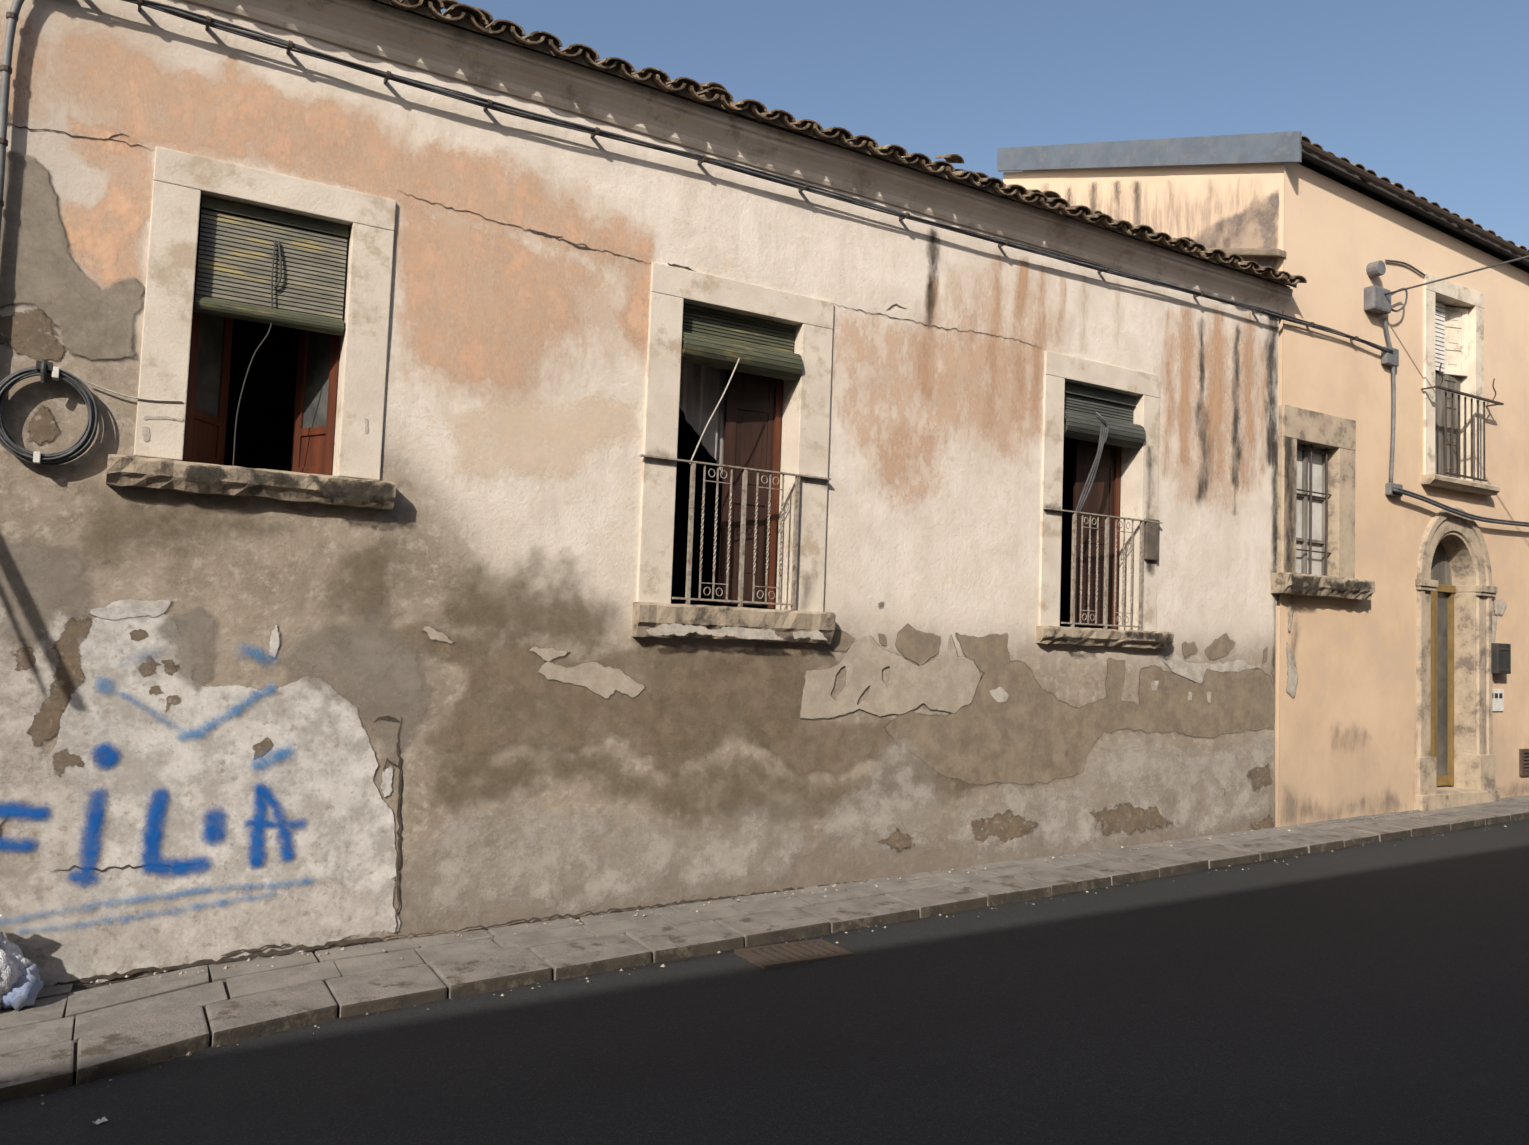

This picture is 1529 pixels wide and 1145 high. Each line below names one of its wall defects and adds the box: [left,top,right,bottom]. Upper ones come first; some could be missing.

crack [7,123,155,150]
leakage [928,230,938,322]
leakage [1197,193,1279,271]
leakage [1266,316,1295,573]
peeling [529,647,646,699]
leakage [289,547,973,911]
peeling [646,623,855,651]
peeling [878,606,1298,785]
peeling [27,599,401,986]
spalling [971,810,1038,843]
leakage [950,740,1272,852]
spalling [1091,802,1173,836]